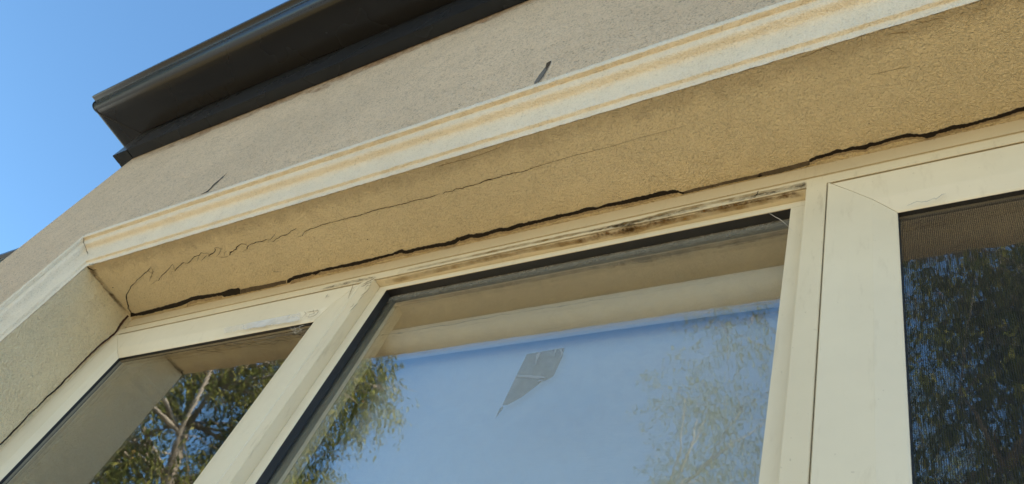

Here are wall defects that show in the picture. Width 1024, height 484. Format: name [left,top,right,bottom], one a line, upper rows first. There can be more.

crack [0,107,1024,445]